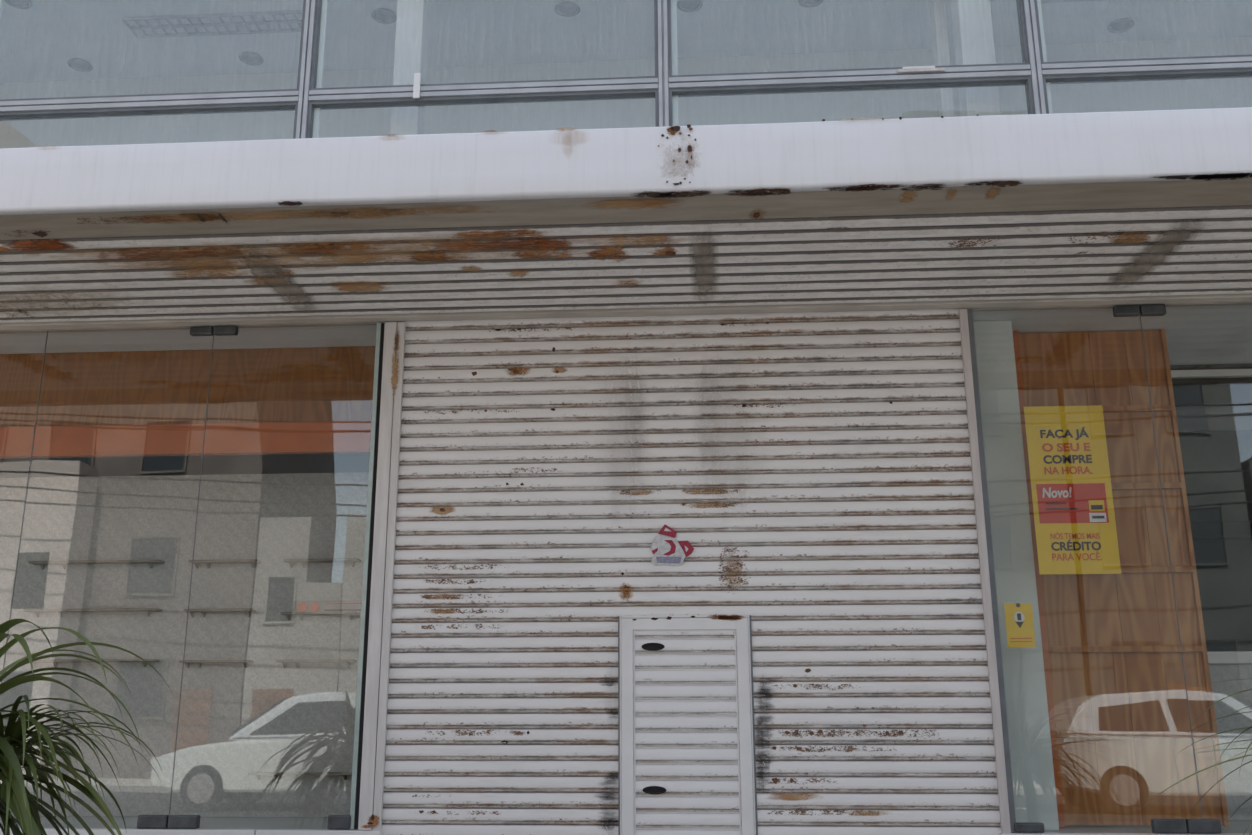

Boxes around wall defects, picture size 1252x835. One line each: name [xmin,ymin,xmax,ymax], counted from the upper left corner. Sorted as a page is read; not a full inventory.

corrosion [78,201,474,224]
corrosion [596,189,790,219]
corrosion [824,181,1023,202]
corrosion [0,230,571,286]
corrosion [588,235,676,262]
corrosion [1070,230,1161,255]
corrosion [333,282,384,293]
corrosion [719,547,751,593]
corrosion [421,564,508,630]
corrosion [772,669,851,690]
corrosion [771,728,939,752]
corrosion [768,778,881,816]